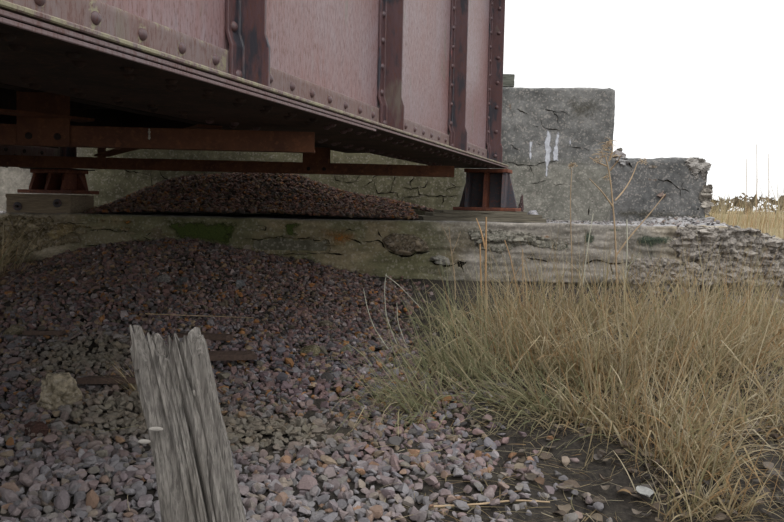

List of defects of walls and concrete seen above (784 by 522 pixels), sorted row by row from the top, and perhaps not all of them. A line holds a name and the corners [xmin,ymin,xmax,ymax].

crack [508,108,565,185]
damp [545,131,559,176]
crack [334,175,462,203]
spalling [685,157,714,216]
crack [245,225,466,272]
spalling [627,224,784,306]